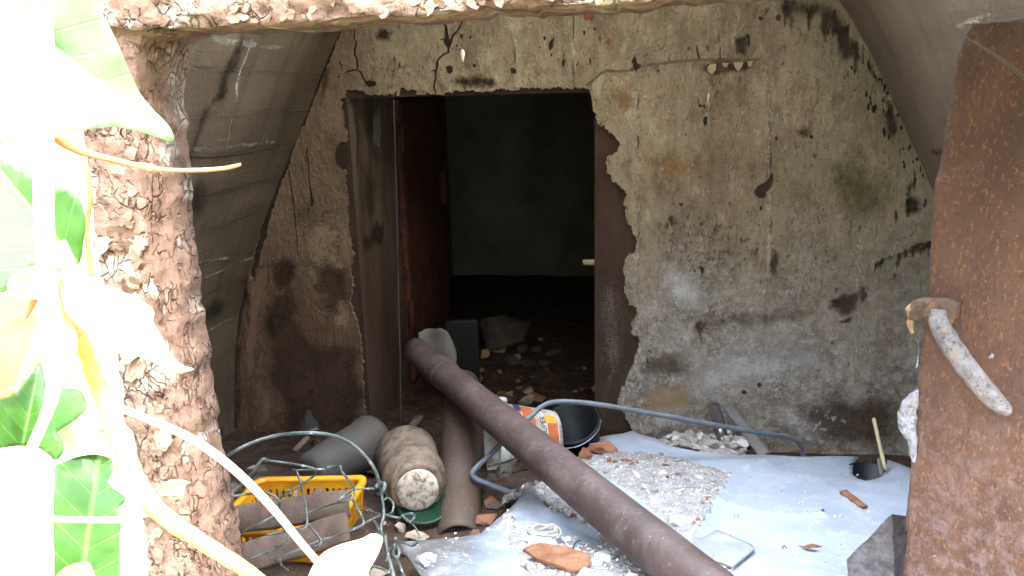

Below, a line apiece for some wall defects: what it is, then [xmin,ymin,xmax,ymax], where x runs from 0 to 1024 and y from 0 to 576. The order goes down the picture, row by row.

crack [337,29,366,81]
crack [431,21,463,94]
crack [586,45,760,86]
leakage [782,0,903,140]
leakage [895,144,927,222]
peeling [245,265,269,381]
leakage [265,262,360,427]
spalling [595,117,697,437]